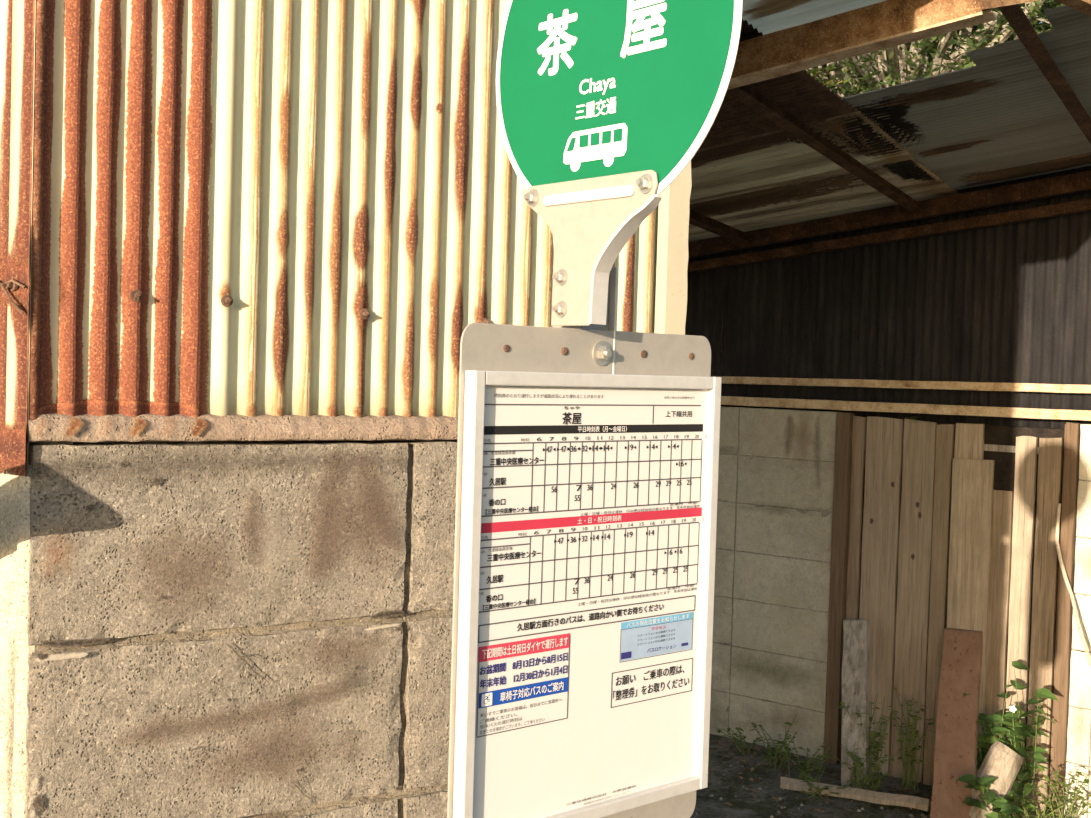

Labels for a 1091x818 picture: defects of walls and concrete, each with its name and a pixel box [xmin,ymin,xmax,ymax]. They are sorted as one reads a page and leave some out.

corrosion [0,0,230,477]
corrosion [248,0,265,417]
corrosion [272,0,292,416]
corrosion [301,0,320,417]
corrosion [328,0,373,417]
corrosion [380,0,397,417]
corrosion [402,0,426,417]
corrosion [429,0,494,417]
corrosion [502,154,512,324]
corrosion [544,224,553,327]
corrosion [623,233,635,332]
damp [125,640,373,781]